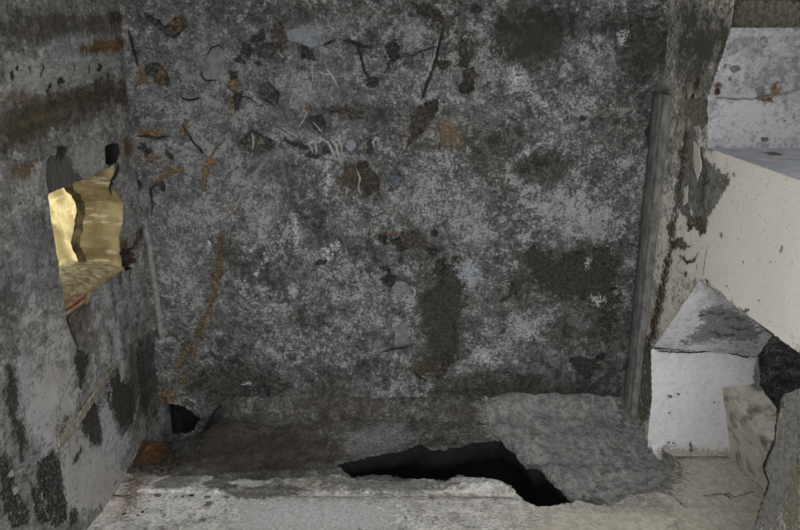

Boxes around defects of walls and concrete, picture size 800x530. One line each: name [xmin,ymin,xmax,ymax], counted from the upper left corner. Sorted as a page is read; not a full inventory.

rust [79,38,123,56]
leakage [1,73,128,151]
spalling [46,144,83,194]
spalling [105,143,120,166]
peeling [666,127,730,277]
leakage [394,168,551,398]
leakage [2,341,40,464]
spalling [170,404,201,434]
rust [113,440,181,523]
spalling [317,440,572,507]